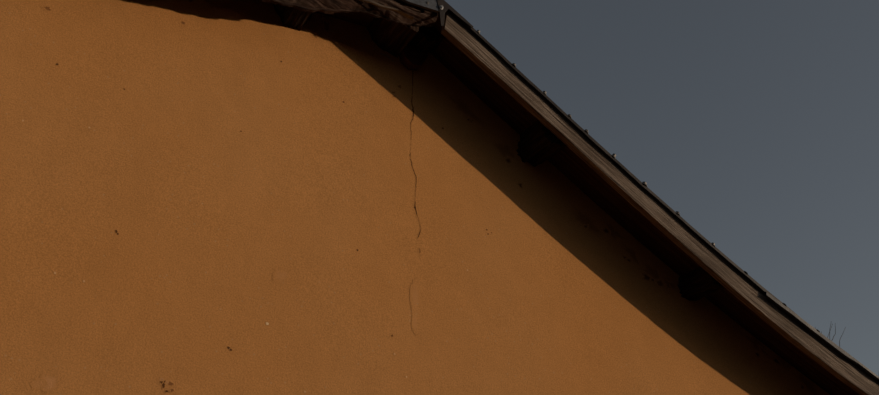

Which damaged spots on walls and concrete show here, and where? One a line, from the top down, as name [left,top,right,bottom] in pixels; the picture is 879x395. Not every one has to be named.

crack [409,70,421,255]